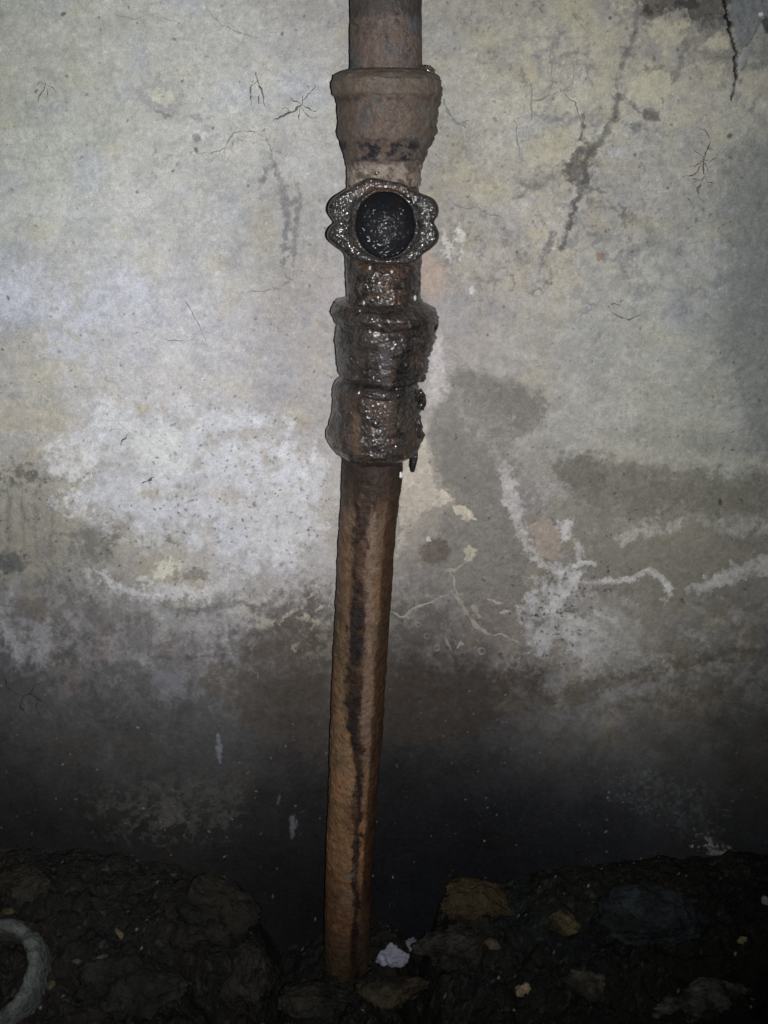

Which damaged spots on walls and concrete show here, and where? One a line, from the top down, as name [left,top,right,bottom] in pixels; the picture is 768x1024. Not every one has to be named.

crack [515,52,583,156]
crack [722,0,742,101]
damp [0,240,341,951]
damp [370,102,768,940]